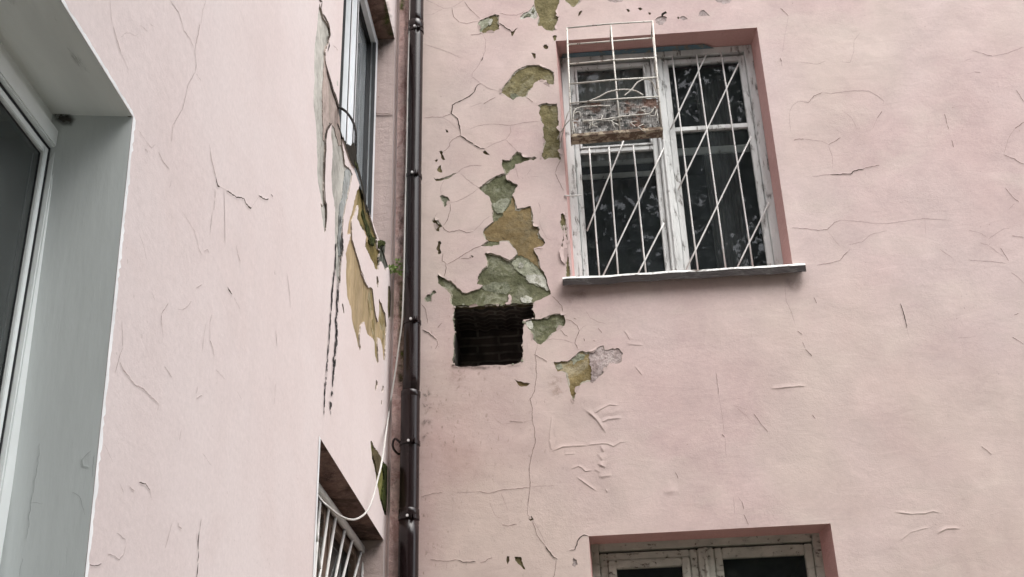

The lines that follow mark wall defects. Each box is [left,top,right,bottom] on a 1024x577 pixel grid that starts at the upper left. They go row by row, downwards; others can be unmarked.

crack [171,1,206,131]
spalling [478,15,499,33]
spalling [499,0,582,100]
crack [185,145,273,253]
spalling [314,9,390,361]
crack [424,0,564,277]
spalling [424,103,566,367]
spalling [559,212,571,277]
crack [789,90,884,176]
spalling [554,346,623,404]
spalling [371,443,388,514]
crack [421,295,603,577]